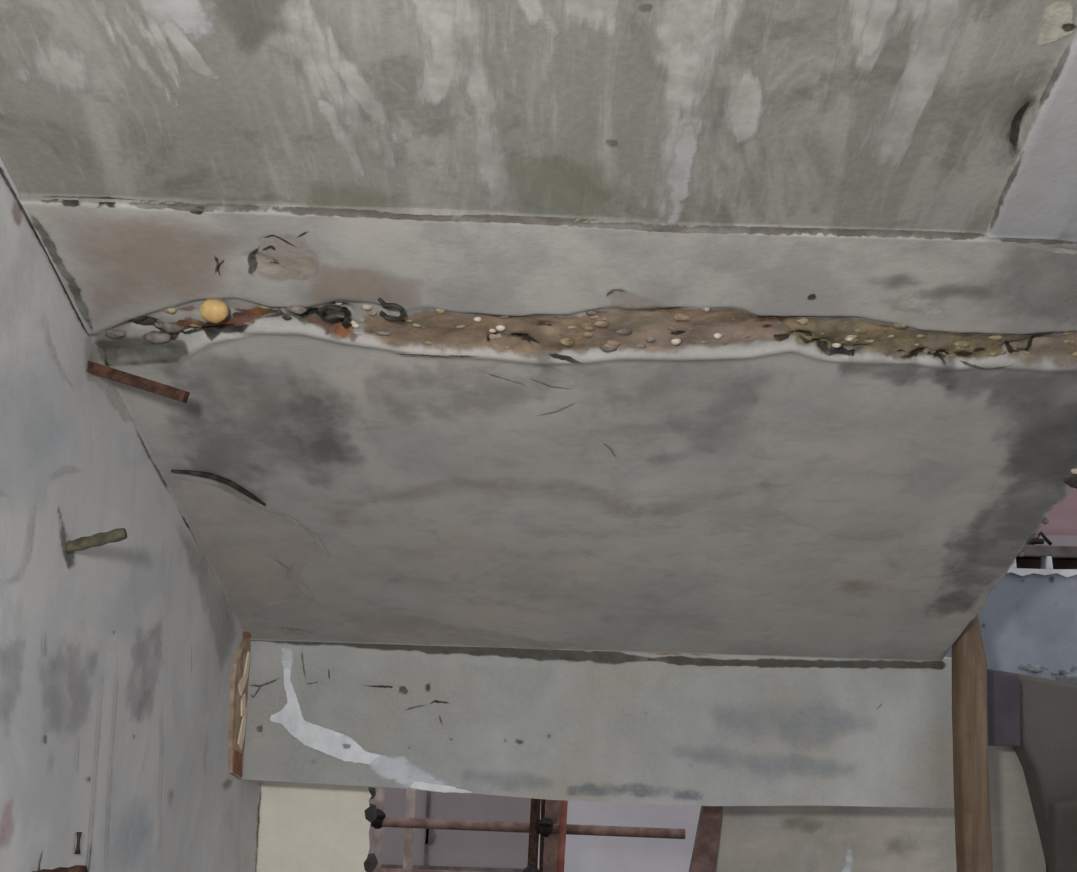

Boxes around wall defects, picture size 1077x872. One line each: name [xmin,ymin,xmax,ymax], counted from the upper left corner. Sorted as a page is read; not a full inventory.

water stain [14,36,88,95]
water stain [89,0,218,106]
water stain [278,0,399,177]
water stain [402,0,509,207]
water stain [517,0,619,37]
water stain [643,0,744,224]
water stain [726,69,764,143]
water stain [849,0,963,167]
crack [1041,50,1067,99]
spalling [764,325,812,341]
spalling [897,347,985,357]
corrosion [62,524,73,566]